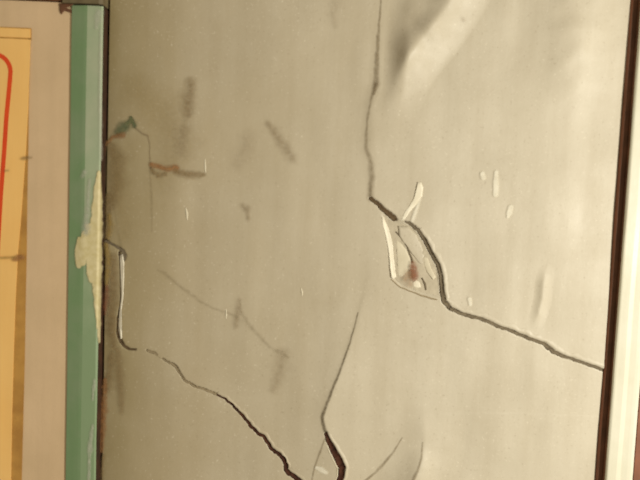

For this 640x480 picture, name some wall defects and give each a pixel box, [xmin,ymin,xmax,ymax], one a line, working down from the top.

crack [104,239,358,480]
flaking render [382,182,439,300]
crack [370,197,604,371]